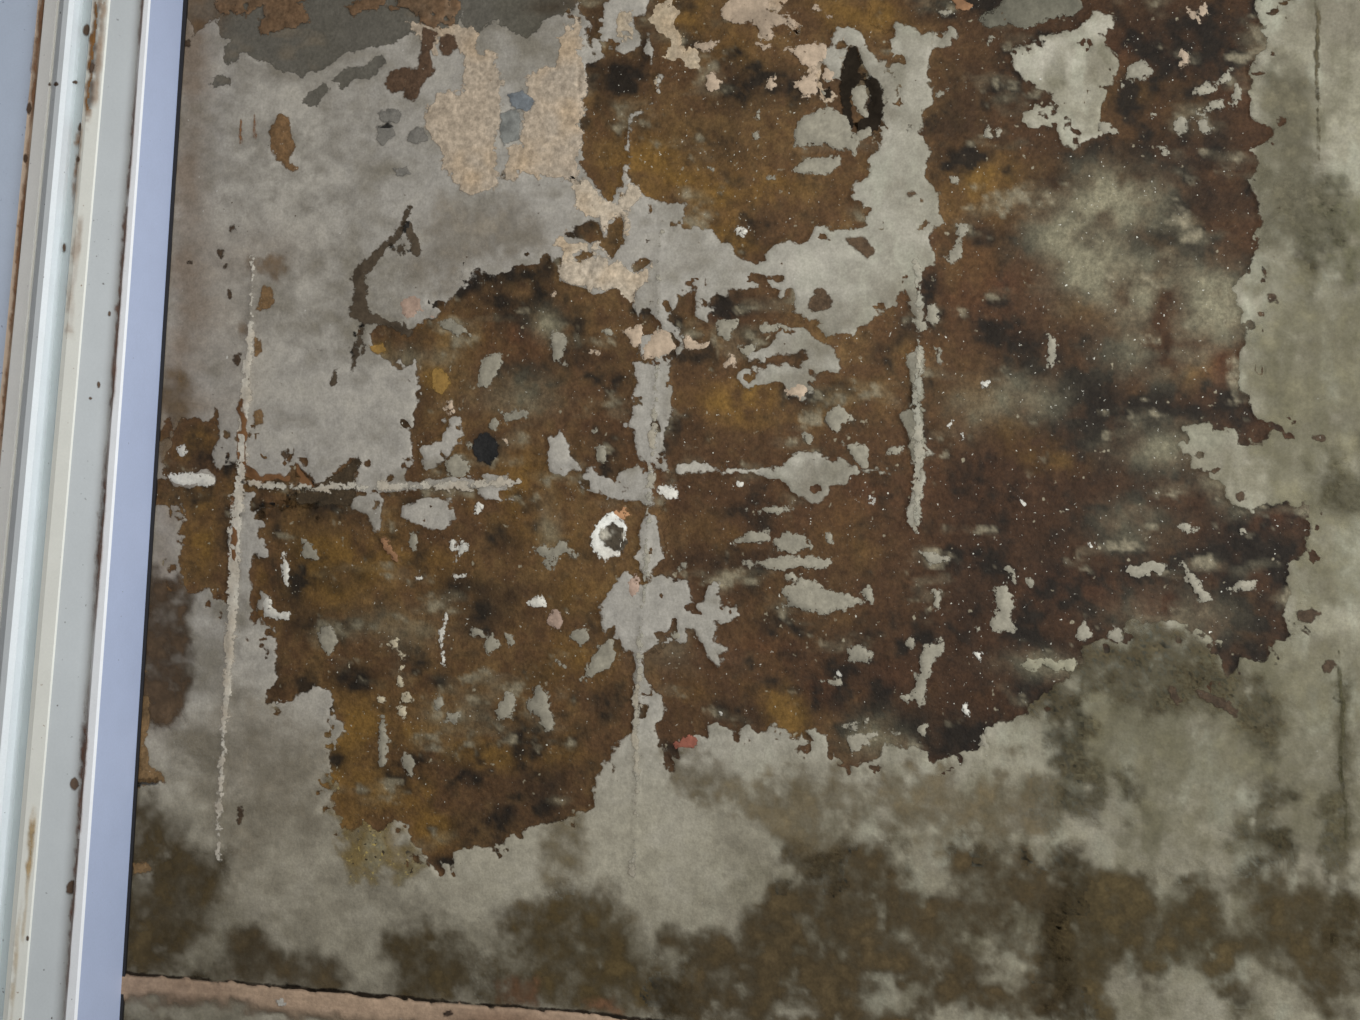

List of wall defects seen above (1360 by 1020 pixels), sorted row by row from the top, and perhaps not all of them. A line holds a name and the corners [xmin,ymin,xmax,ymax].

crack [1313,10,1321,159]
damp [1257,71,1360,280]
peeling [156,0,1322,877]
damp [127,807,227,977]
damp [192,928,343,989]
damp [338,815,425,884]
crack [126,971,659,1020]
damp [383,619,1360,1020]
peeling [1322,660,1337,673]
crack [1338,651,1347,838]